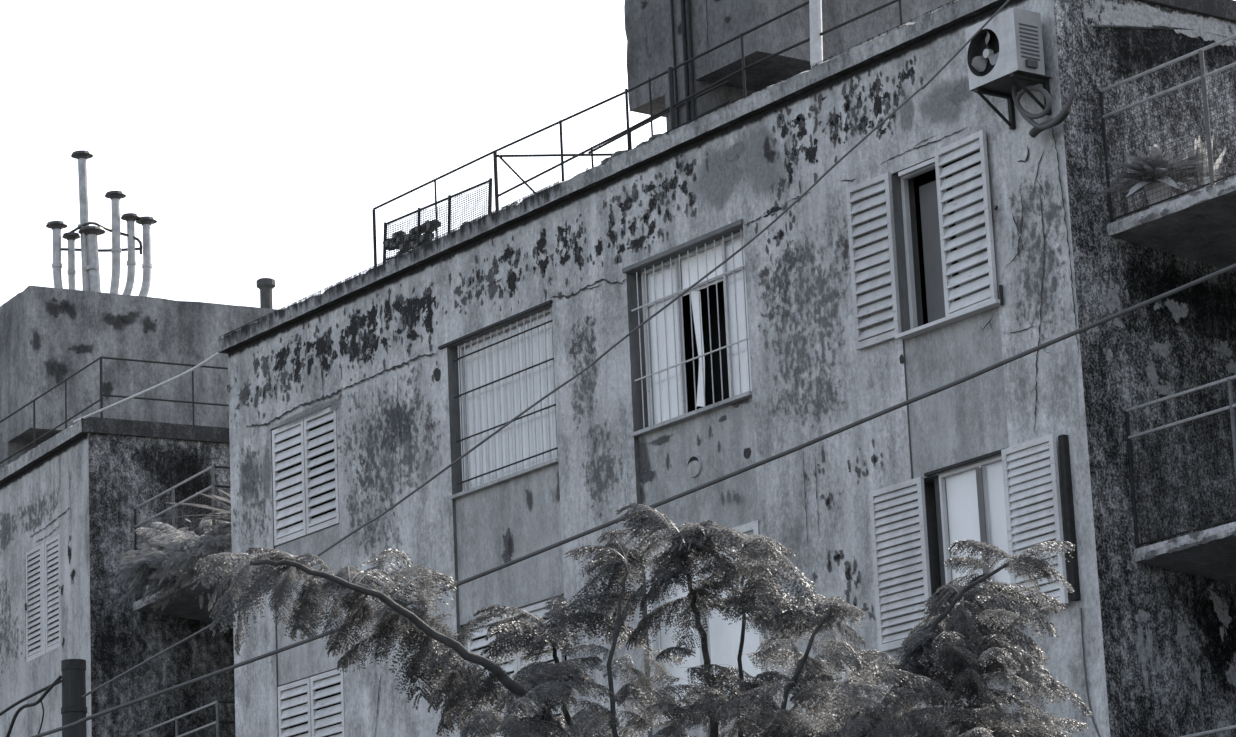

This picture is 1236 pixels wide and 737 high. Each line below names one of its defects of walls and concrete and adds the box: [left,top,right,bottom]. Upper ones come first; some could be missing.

damp [1084,10,1236,79]
peeling [747,54,923,254]
peeling [227,146,708,422]
damp [750,217,855,427]
damp [1120,258,1236,349]
damp [570,316,672,517]
damp [697,399,748,452]
damp [0,488,69,674]
damp [1175,590,1236,703]